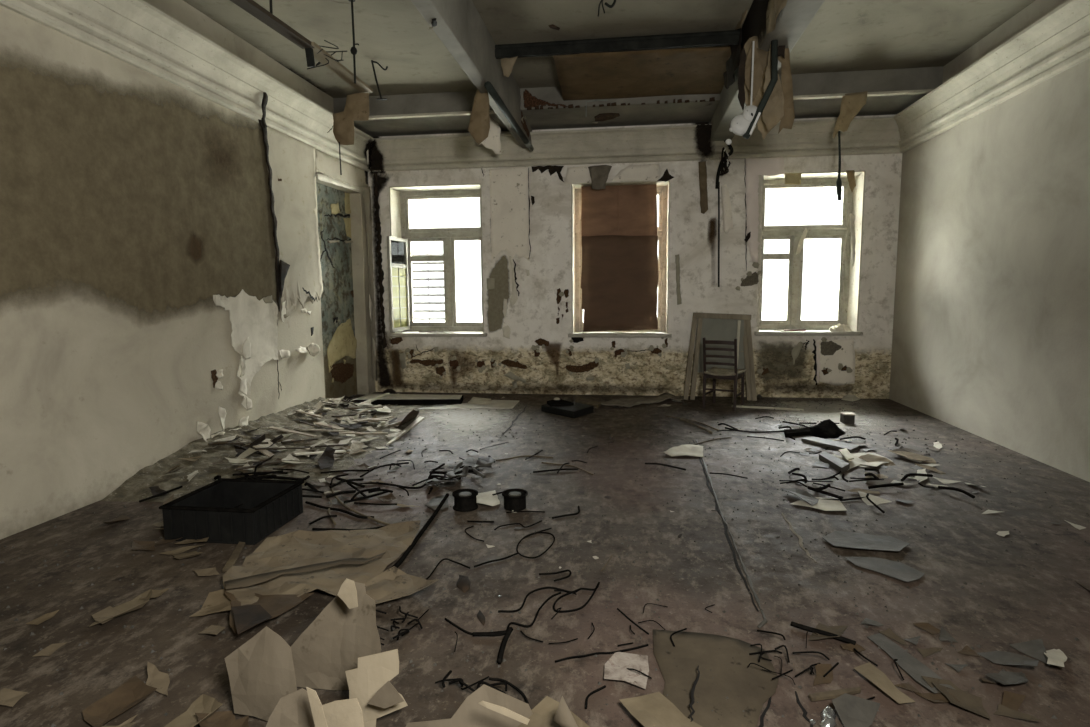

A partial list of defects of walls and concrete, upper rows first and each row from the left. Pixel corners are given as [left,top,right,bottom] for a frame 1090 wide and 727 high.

leakage [0,57,281,319]
flaking render [487,255,511,339]
peeling [196,289,357,442]
flaking render [388,336,461,378]
flaking render [475,338,549,388]
flaking render [566,332,599,381]
flaking render [610,341,630,369]
flaking render [648,337,668,357]
peeling [817,337,855,386]